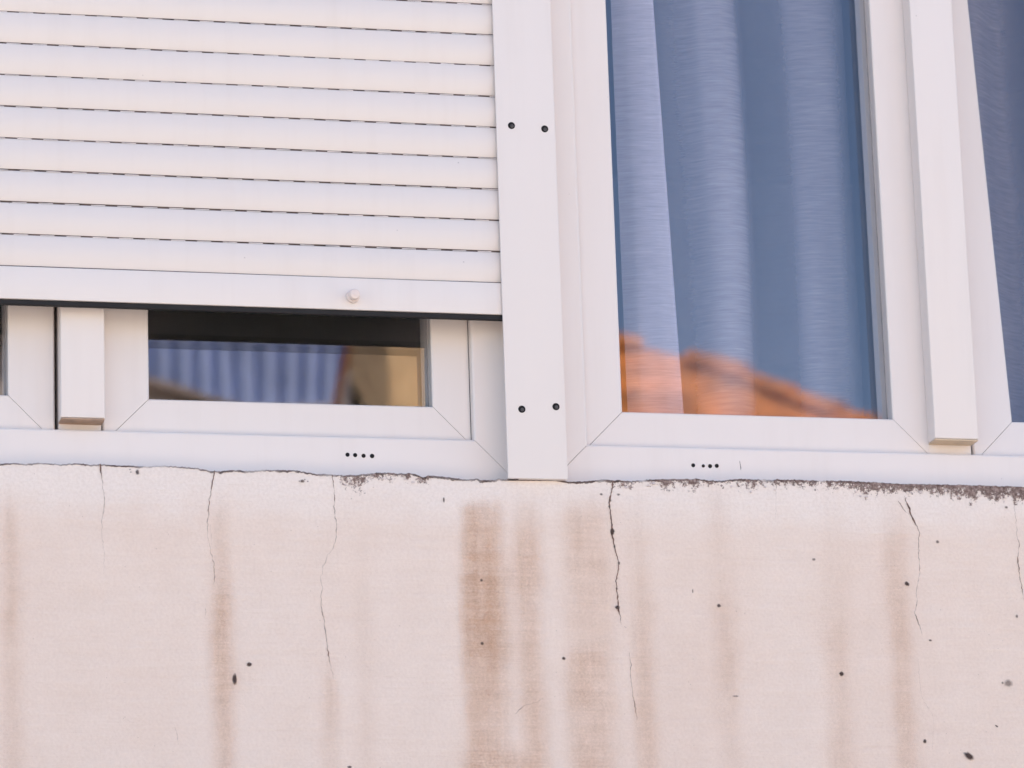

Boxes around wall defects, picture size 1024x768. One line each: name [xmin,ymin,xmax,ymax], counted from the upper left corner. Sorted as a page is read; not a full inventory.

crack [0,463,138,477]
crack [170,466,806,620]
crack [839,480,1016,549]